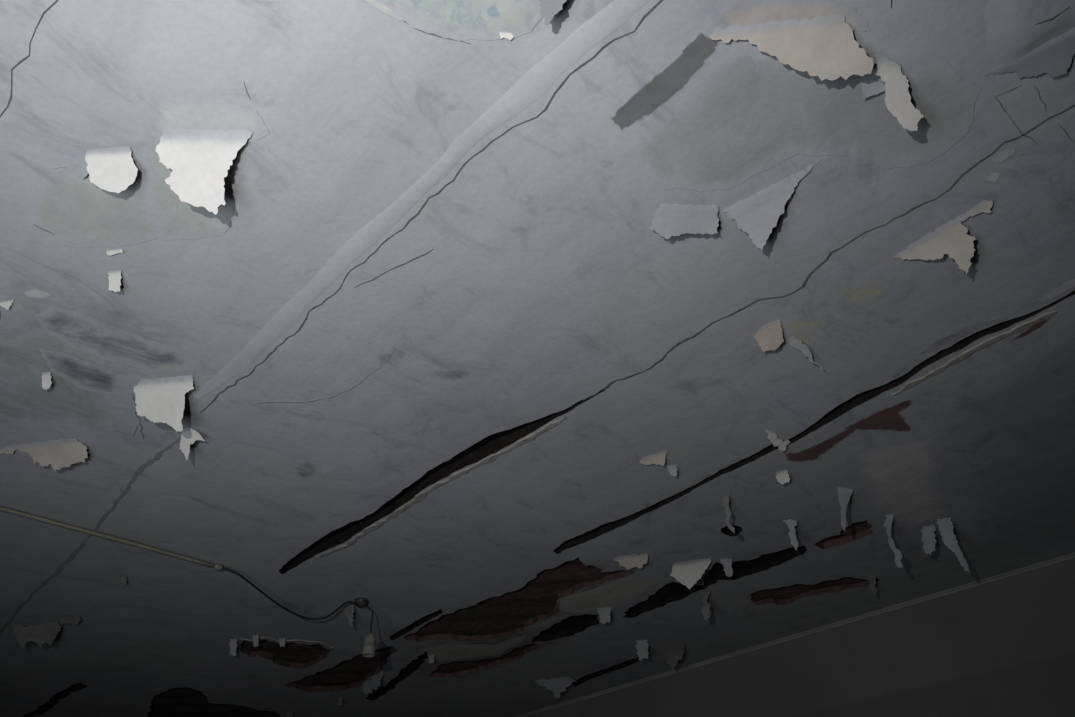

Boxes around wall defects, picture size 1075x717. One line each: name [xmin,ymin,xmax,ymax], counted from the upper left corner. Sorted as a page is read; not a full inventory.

crack [0,0,58,117]
peeling [362,0,567,41]
peeling [629,0,981,251]
peeling [32,96,270,256]
peeling [108,270,122,292]
peeling [892,200,993,274]
peeling [0,438,88,471]
peeling [133,372,205,460]
peeling [229,290,1075,705]